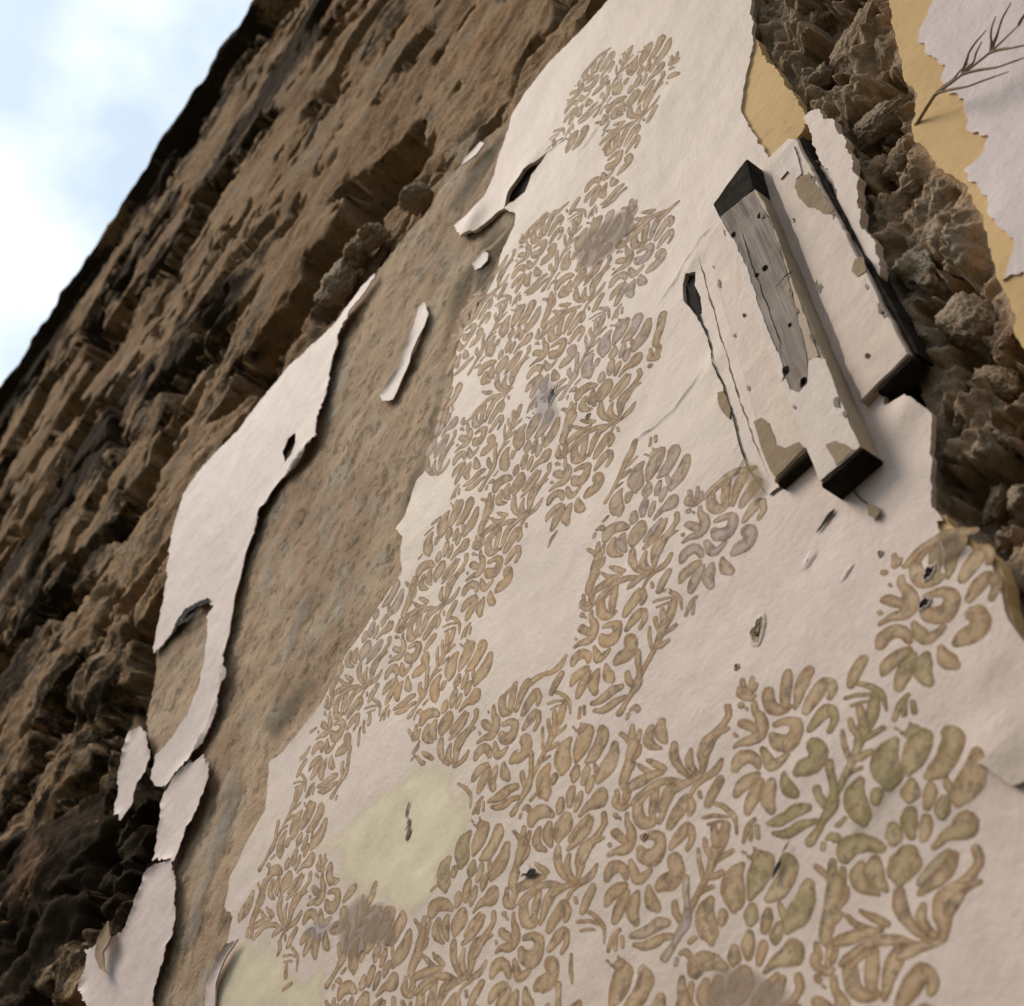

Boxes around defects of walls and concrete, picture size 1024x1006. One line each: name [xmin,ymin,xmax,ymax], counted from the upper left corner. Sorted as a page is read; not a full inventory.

peeling [461,141,485,166]
peeling [794,172,835,220]
peeling [472,251,489,271]
peeling [851,257,869,290]
peeling [380,302,429,401]
crack [633,228,781,496]
peeling [754,417,805,477]
peeling [826,441,855,465]
peeling [78,274,376,1006]
leakage [331,770,465,951]